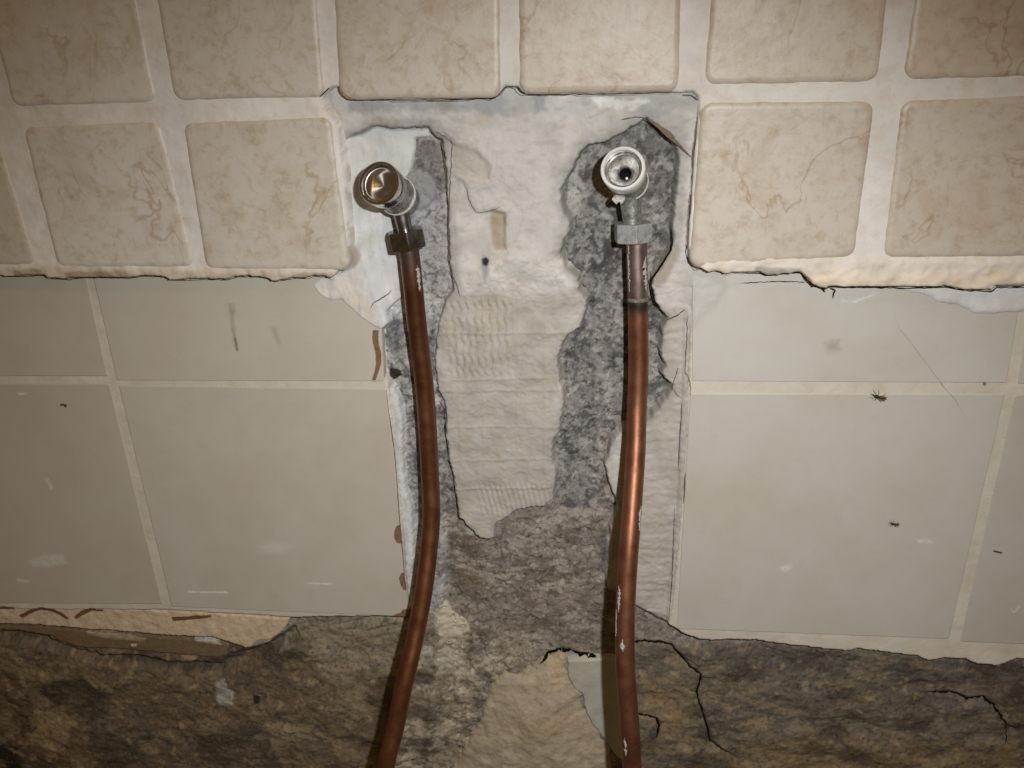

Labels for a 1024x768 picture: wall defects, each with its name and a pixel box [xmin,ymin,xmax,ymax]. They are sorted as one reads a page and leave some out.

spalling [0,294,422,768]
spalling [395,118,691,768]
spalling [635,605,1024,768]
crack [931,691,1009,741]